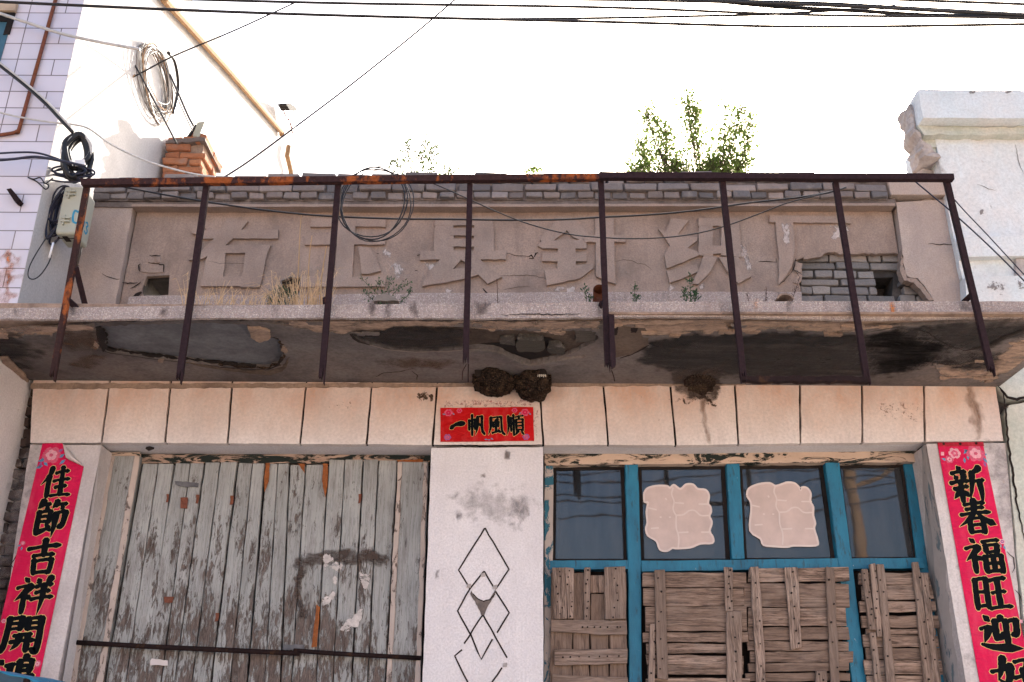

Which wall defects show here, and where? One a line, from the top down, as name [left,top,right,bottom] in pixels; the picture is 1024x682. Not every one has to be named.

spalling [793,249,933,302]
spalling [0,323,290,375]
spalling [289,320,600,370]
damp [637,320,1024,377]